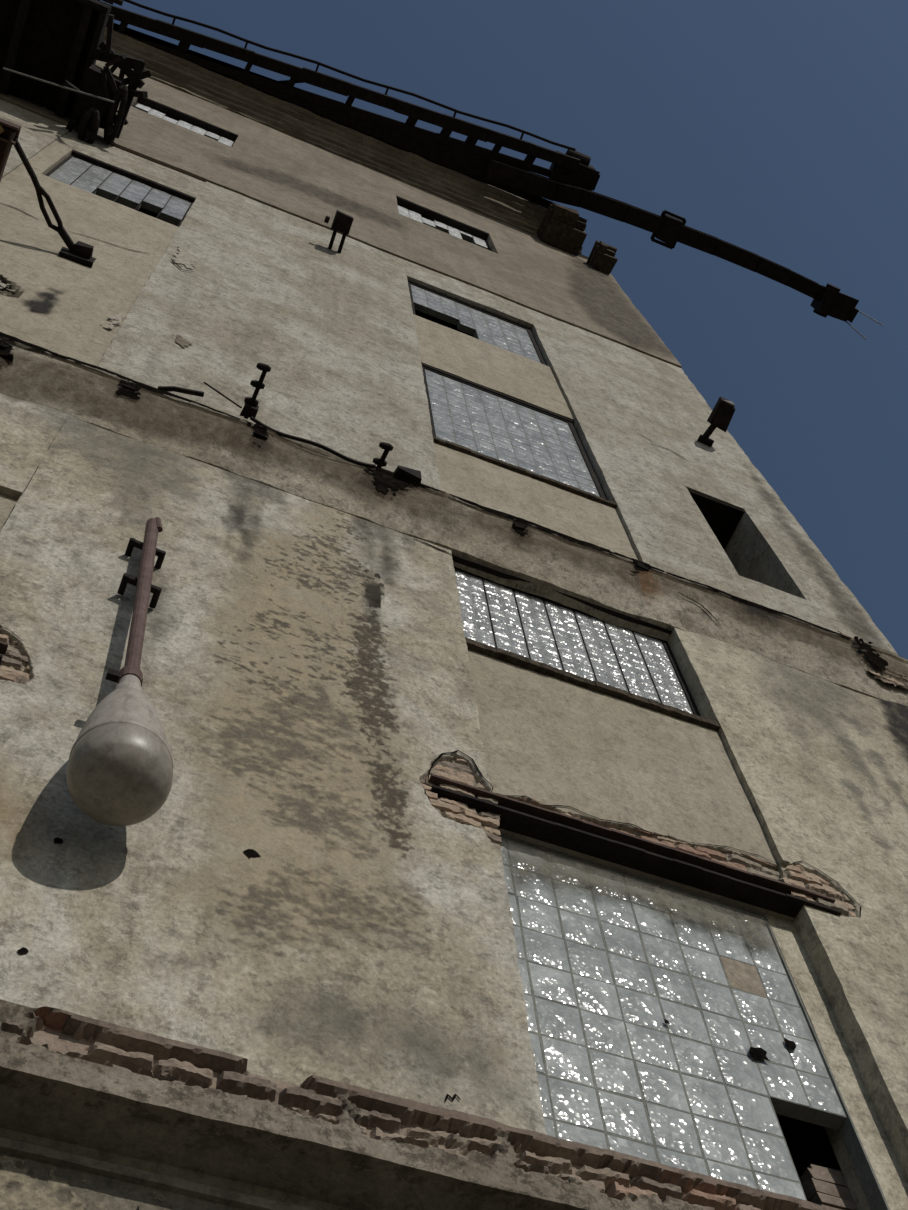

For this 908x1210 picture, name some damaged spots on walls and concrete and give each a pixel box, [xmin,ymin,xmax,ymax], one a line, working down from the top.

peeling [0,351,14,365]
spalling [0,629,30,684]
spalling [838,630,908,690]
spalling [520,798,857,917]
flaking render [0,999,835,1210]